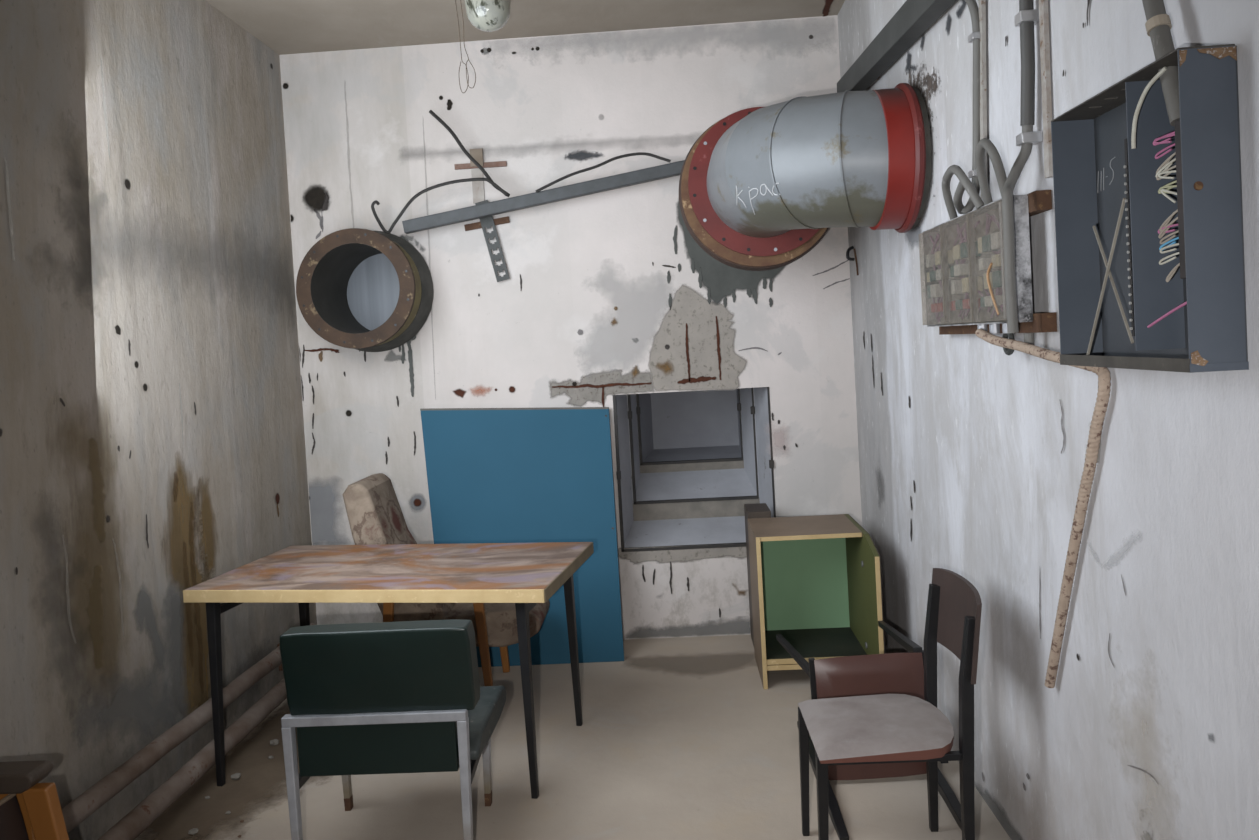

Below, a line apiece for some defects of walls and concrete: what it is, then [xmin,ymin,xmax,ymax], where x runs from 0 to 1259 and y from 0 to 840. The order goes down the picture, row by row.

spalling [550,285,747,407]
damp [68,429,116,687]